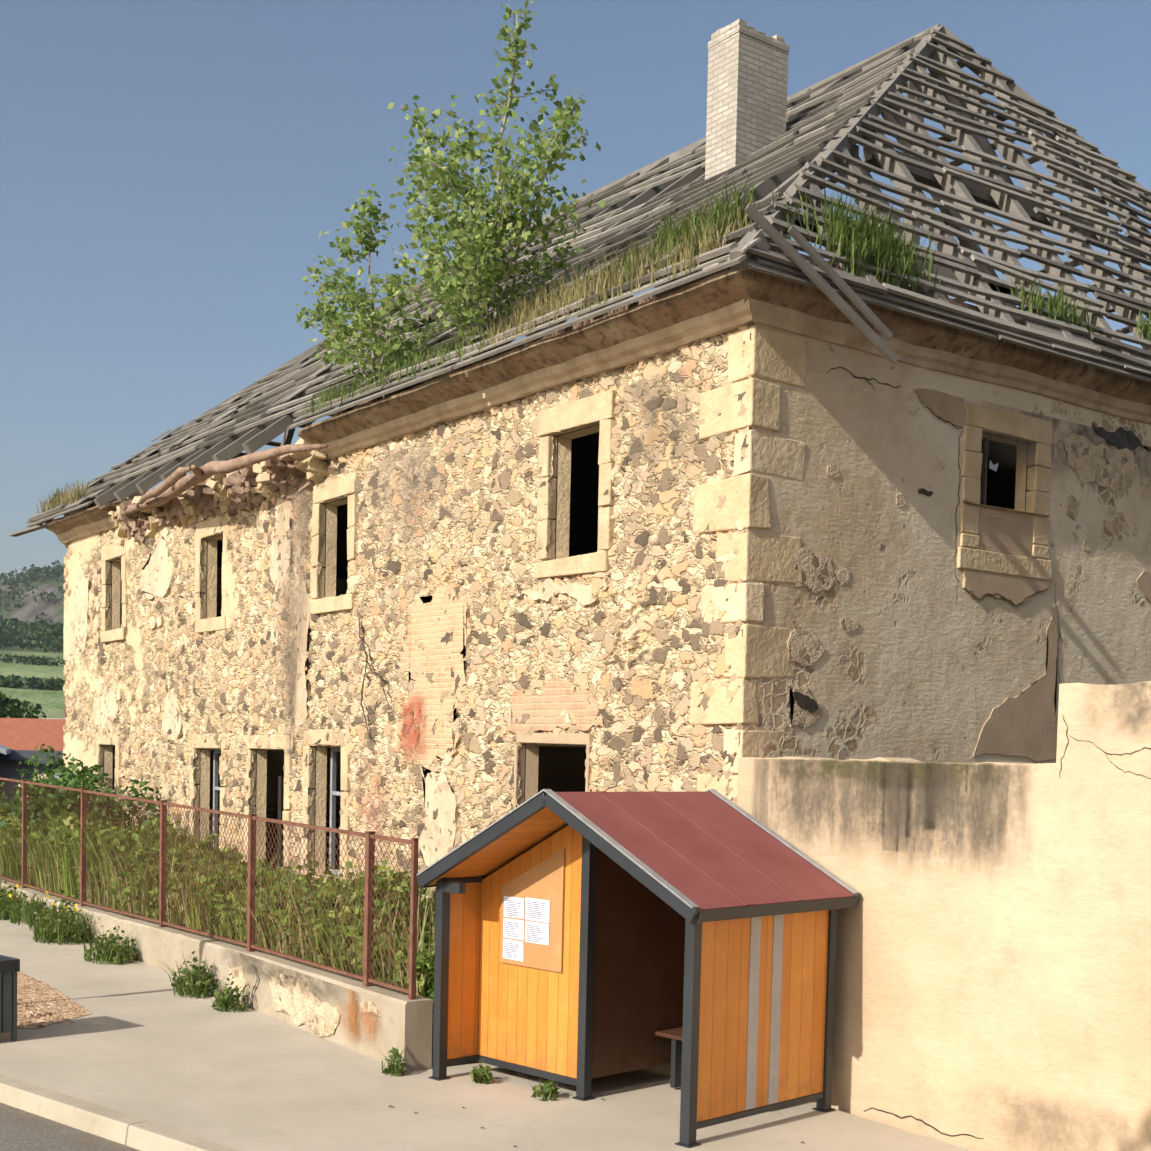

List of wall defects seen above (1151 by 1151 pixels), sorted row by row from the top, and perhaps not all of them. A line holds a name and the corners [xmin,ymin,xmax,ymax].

spalling [1062,423,1151,497]
crack [827,367,1065,684]
spalling [794,548,850,593]
flaking render [962,569,1051,605]
spalling [789,685,822,729]
flaking render [973,615,1059,762]
crack [1056,714,1151,779]
water stain [774,759,888,831]
water stain [896,762,1007,847]
spalling [226,962,249,991]
spalling [266,971,341,1037]
corrosion [347,990,375,1034]